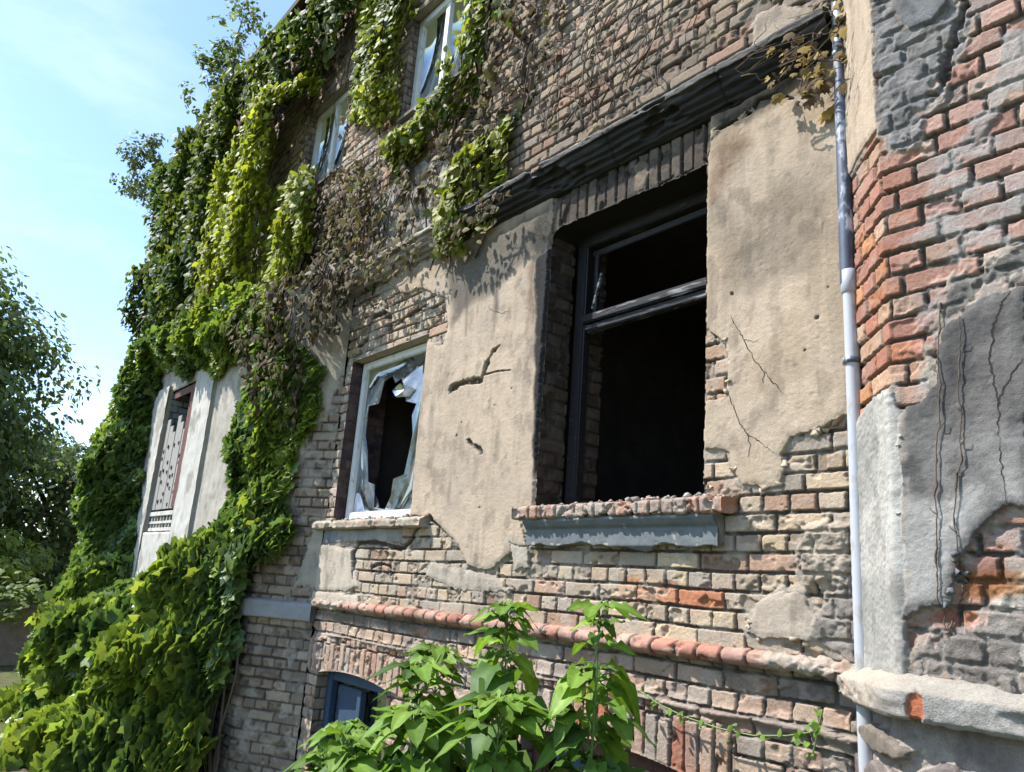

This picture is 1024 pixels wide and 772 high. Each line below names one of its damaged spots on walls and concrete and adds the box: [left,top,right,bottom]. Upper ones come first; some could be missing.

crack [450,344,511,392]
crack [727,394,776,458]
crack [731,317,784,394]
crack [988,292,1020,501]
peeling [704,388,1024,675]